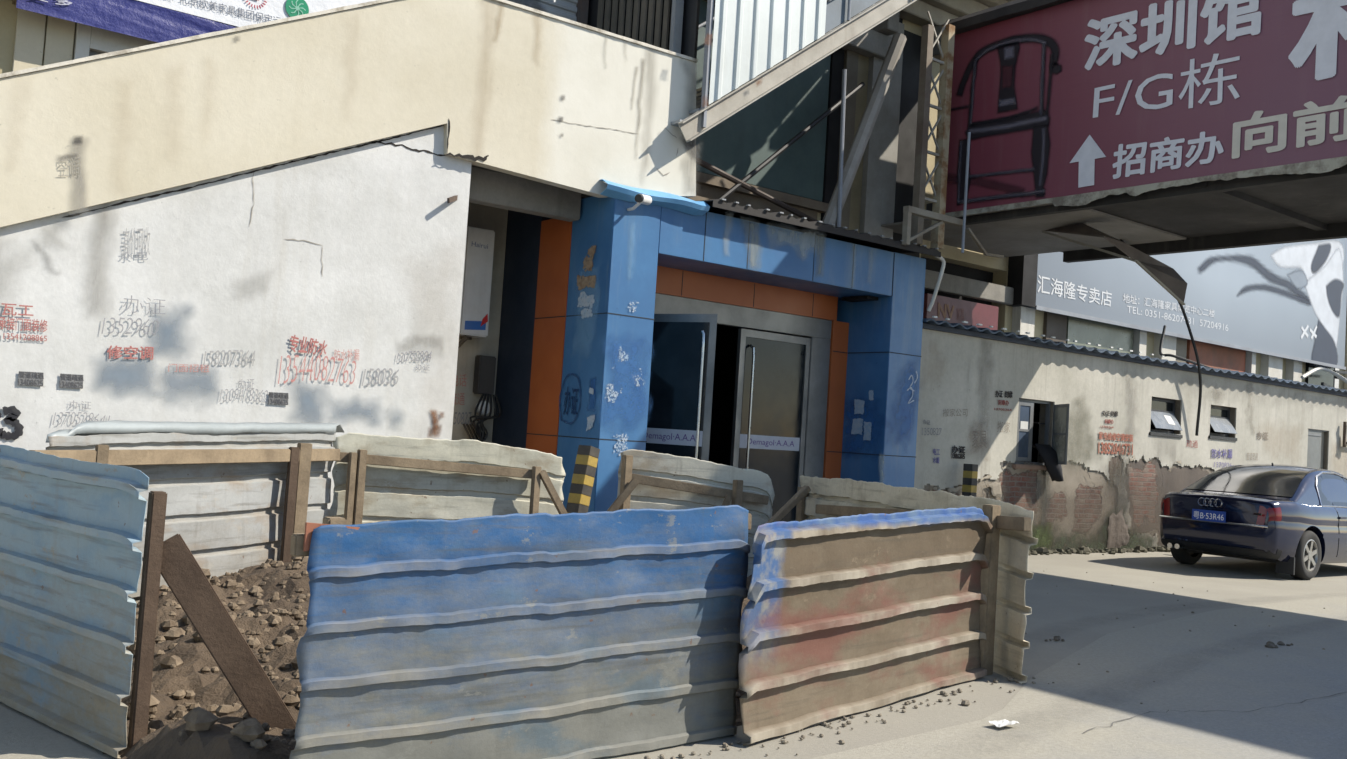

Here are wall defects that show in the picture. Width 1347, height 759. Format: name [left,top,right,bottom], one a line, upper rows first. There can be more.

crack [64,120,489,226]
spalling [927,455,1214,550]